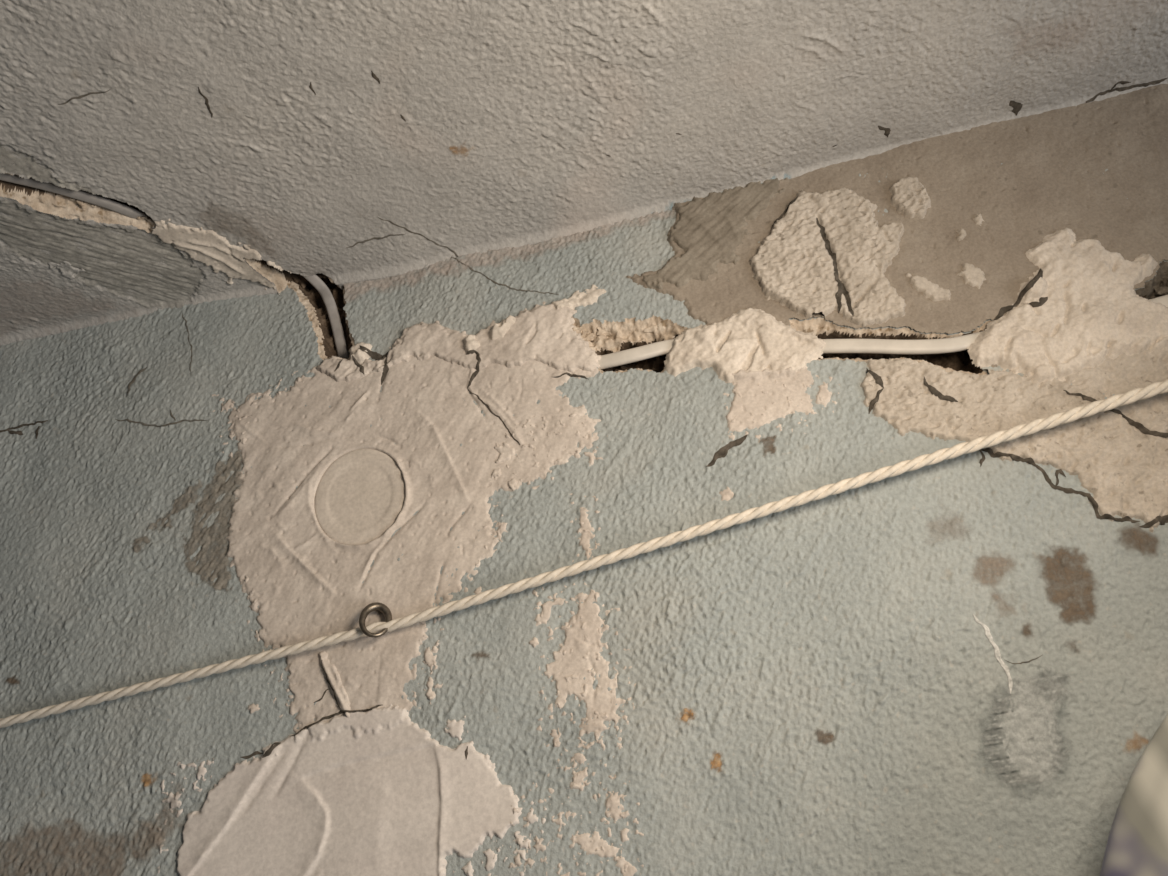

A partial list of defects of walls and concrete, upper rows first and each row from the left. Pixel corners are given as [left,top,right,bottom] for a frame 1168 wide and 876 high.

crack [58,89,111,105]
flaking render [572,84,1168,374]
crack [0,420,48,439]
crack [1063,390,1168,438]
leakage [133,480,202,553]
peeling [476,413,608,575]
crack [979,448,1168,528]
flaking render [412,617,444,709]
crack [241,664,381,759]
peeling [453,575,644,876]
leakage [0,809,173,876]
peeling [154,758,214,874]